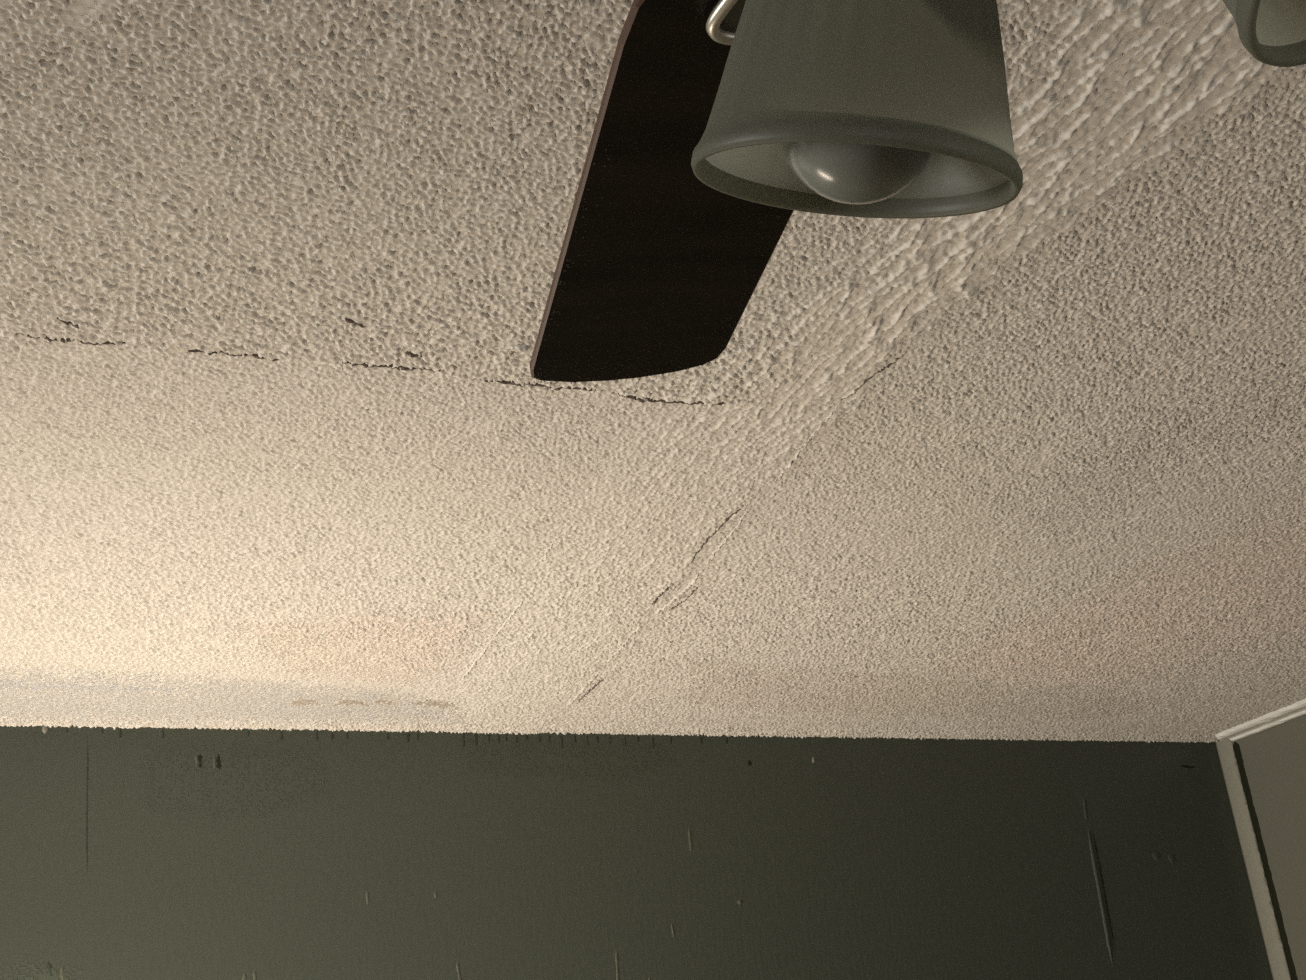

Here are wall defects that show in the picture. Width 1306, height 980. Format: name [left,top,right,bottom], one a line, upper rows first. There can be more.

crack [11,317,126,346]
crack [344,317,366,328]
crack [178,347,283,362]
crack [339,350,444,372]
crack [480,379,726,406]